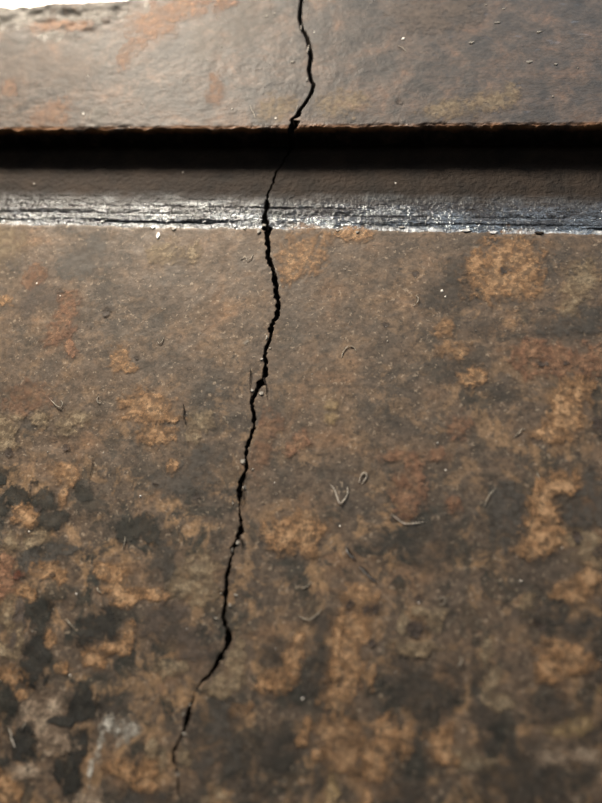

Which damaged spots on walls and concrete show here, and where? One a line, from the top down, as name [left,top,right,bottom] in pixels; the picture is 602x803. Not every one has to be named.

rust [458,230,548,306]
rust [116,385,213,445]
crack [172,0,316,796]
rust [508,336,602,444]
rust [260,508,332,559]
rust [508,468,602,603]
rust [92,548,219,608]
rust [0,502,82,756]
rust [82,619,137,669]
rust [201,619,305,700]
rust [294,582,498,803]
rust [0,763,42,803]